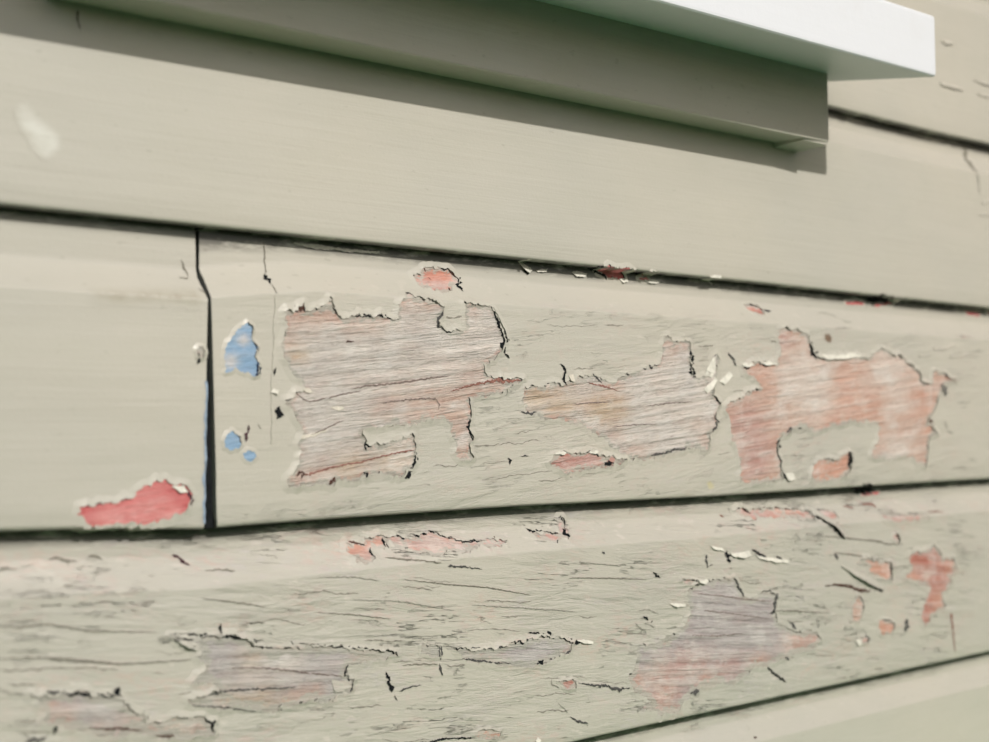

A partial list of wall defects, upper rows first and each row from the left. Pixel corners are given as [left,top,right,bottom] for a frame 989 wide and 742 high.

peeling [192,342,208,364]
peeling [220,259,959,495]
peeling [71,472,198,533]
peeling [339,524,510,571]
peeling [521,510,574,548]
peeling [719,483,960,650]
peeling [23,624,402,742]
peeling [450,629,578,693]
peeling [625,546,828,723]
peeling [430,725,503,742]